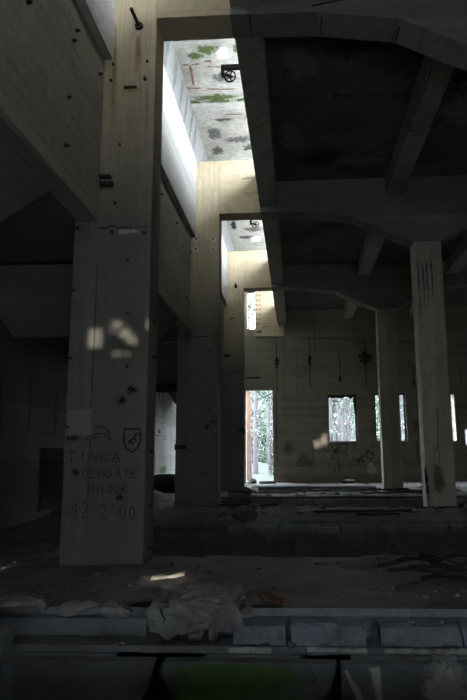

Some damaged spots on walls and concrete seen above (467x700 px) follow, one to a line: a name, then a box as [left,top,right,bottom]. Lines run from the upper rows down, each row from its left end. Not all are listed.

leakage [164,41,252,156]